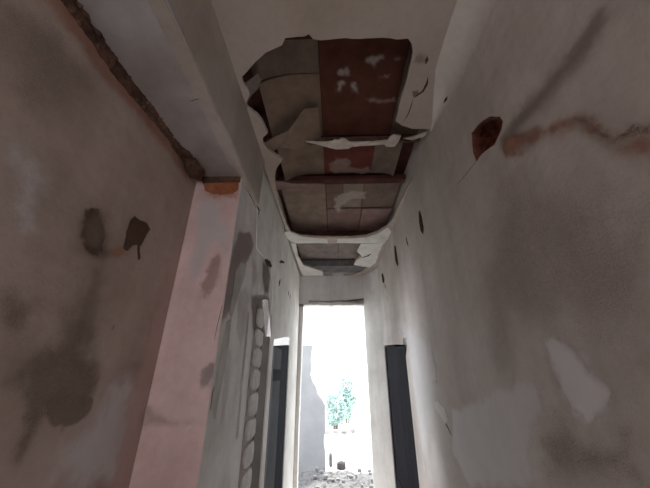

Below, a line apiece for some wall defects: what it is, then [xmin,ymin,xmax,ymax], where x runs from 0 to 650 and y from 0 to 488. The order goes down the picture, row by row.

spalling [61,0,193,164]
spalling [460,116,503,181]
peeling [62,200,150,264]
peeling [105,227,187,488]